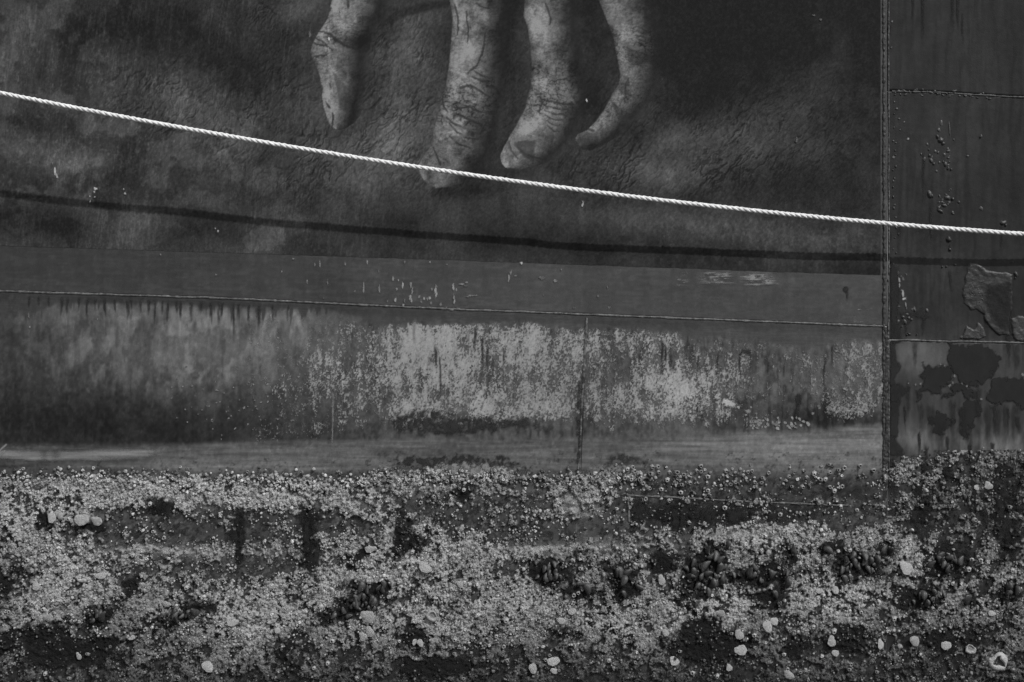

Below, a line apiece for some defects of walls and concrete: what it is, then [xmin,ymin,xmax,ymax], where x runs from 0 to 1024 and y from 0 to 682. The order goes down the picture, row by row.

damp [28,297,273,323]
peeling [959,263,1024,342]